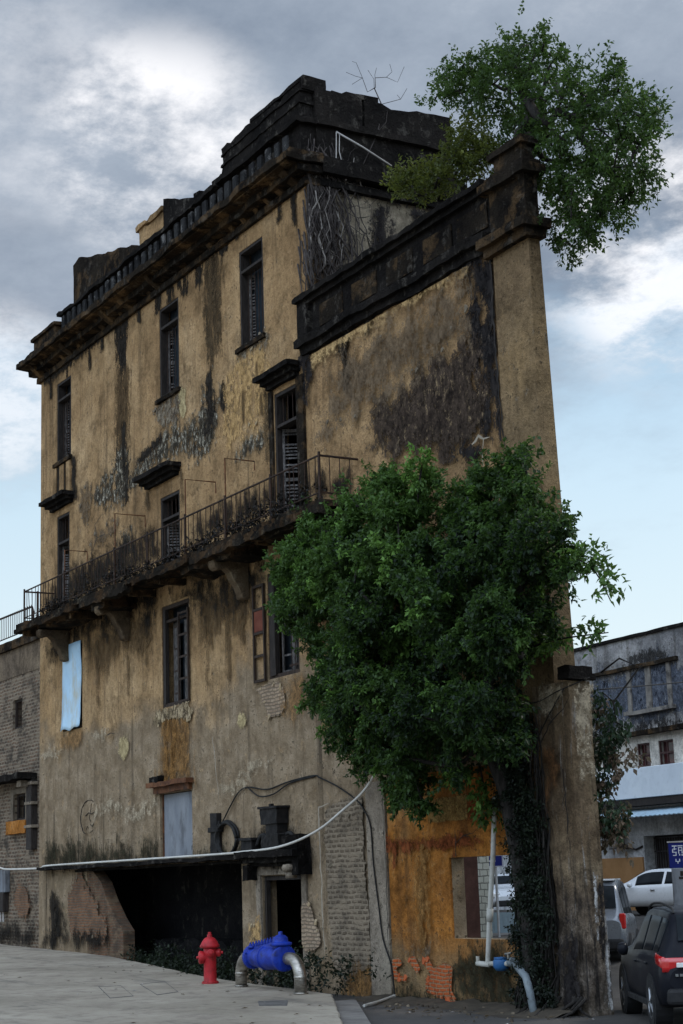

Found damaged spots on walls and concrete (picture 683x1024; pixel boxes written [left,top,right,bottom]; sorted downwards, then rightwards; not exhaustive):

leakage [274,192,297,228]
leakage [364,257,502,475]
leakage [44,236,238,609]
leakage [235,389,269,464]
spalling [152,701,193,727]
spalling [256,681,285,721]
leakage [42,830,160,877]
corrosion [385,788,491,871]
flaking render [65,872,108,945]
flaking render [301,796,371,986]
flaking render [392,956,456,1002]